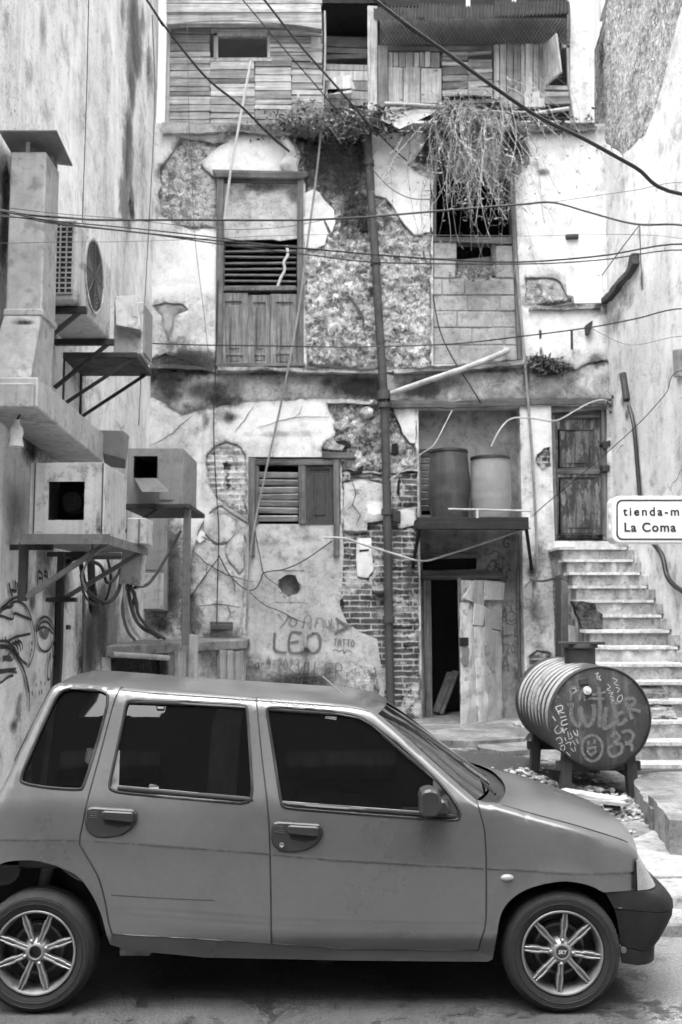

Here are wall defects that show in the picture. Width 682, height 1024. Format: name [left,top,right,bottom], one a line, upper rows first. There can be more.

water stain [122,1,150,227]
water stain [159,351,235,423]
crack [235,406,323,432]
spalling [151,130,610,719]
crack [191,536,255,620]